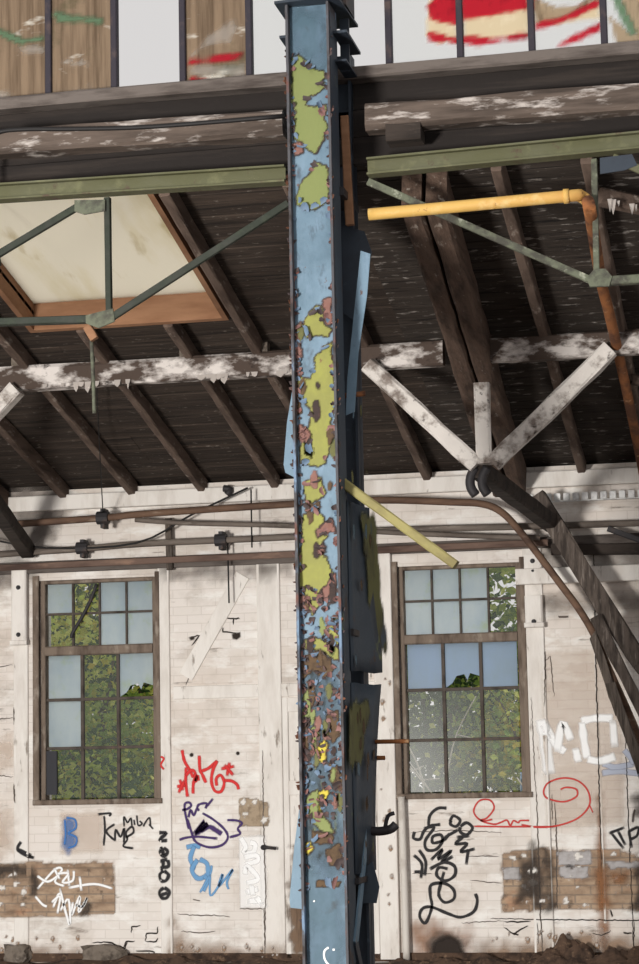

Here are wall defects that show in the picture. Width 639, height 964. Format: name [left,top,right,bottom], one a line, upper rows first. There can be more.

peeling [283,50,335,245]
corrosion [581,195,605,269]
peeling [197,373,228,384]
corrosion [597,287,639,474]
peeling [276,264,375,891]
peeling [353,513,387,654]
spalling [0,861,115,917]
spalling [501,847,639,912]